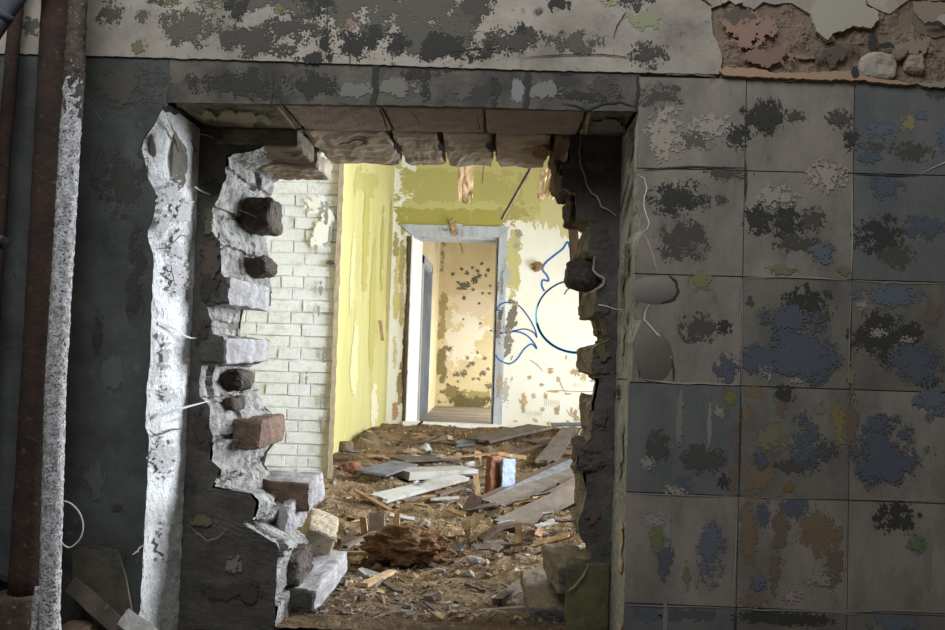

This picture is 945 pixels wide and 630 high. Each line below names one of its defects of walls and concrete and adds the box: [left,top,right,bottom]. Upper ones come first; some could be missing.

damp [87,0,625,109]
spalling [711,0,945,88]
mould [680,96,805,153]
mould [644,165,754,266]
damp [741,201,827,253]
spalling [199,255,278,312]
spalling [198,337,285,451]
spalling [216,128,347,613]
damp [438,242,492,352]
damp [504,298,518,365]
spalling [513,346,611,473]
spalling [564,258,611,321]